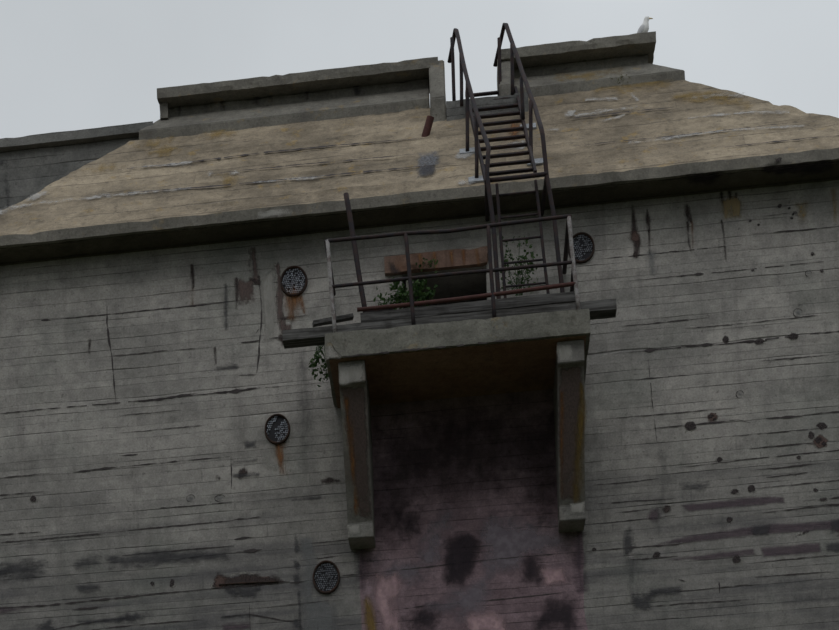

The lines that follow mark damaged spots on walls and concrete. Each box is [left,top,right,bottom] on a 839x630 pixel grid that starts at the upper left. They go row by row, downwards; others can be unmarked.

rust [631,208,650,257]
leakage [339,364,363,384]
leakage [365,565,417,630]
leakage [414,518,561,630]
leakage [541,568,565,585]
leakage [537,601,575,630]